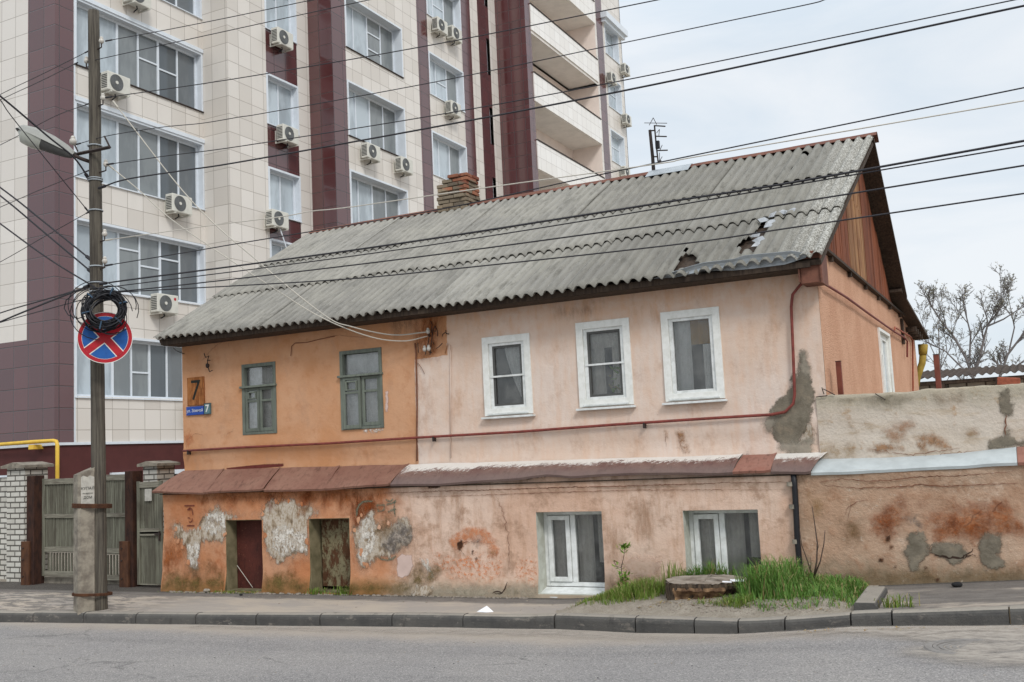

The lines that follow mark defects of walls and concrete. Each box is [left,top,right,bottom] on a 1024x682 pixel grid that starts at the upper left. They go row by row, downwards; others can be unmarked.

flaking render [174,506,237,569]
flaking render [261,498,313,564]
flaking render [353,507,412,568]
crack [824,448,1015,559]
rust [933,502,1022,540]